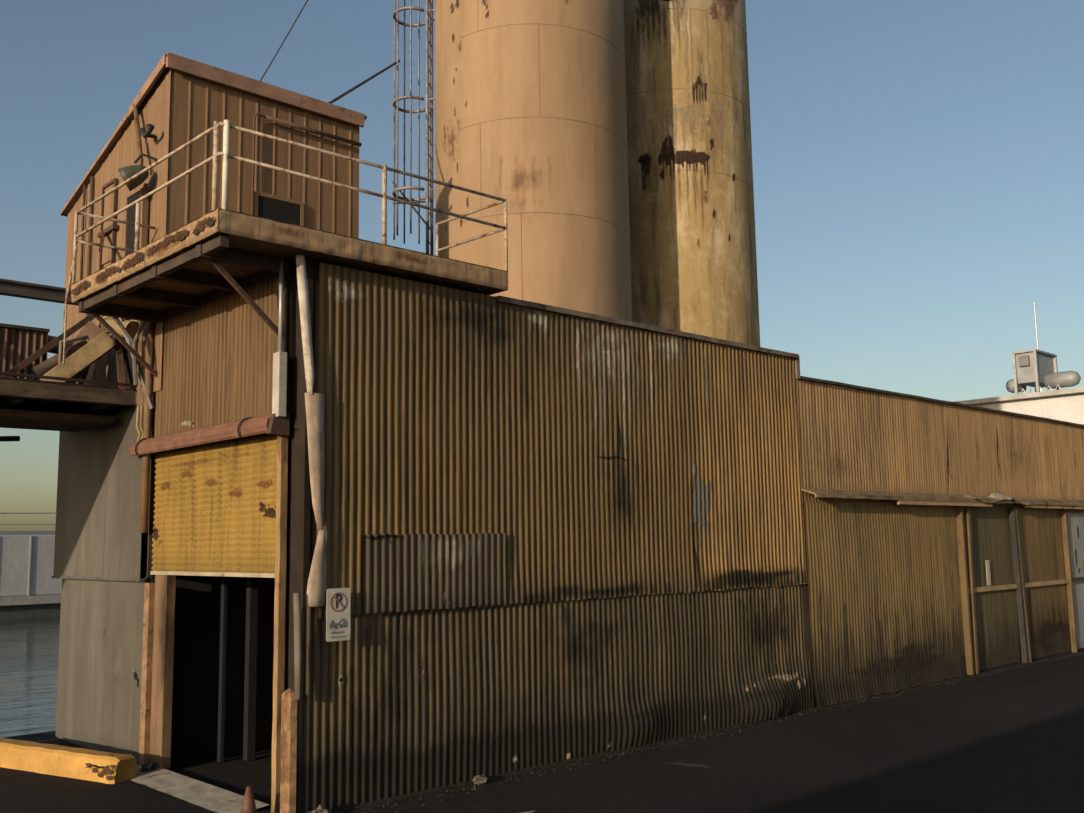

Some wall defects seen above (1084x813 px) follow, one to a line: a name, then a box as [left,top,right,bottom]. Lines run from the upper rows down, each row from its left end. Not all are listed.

rust [692,76,707,101]
rust [638,135,709,194]
water stain [649,339,678,367]
water stain [576,332,652,424]
rust [259,502,276,518]
peeling [689,461,711,549]
water stain [707,570,805,590]